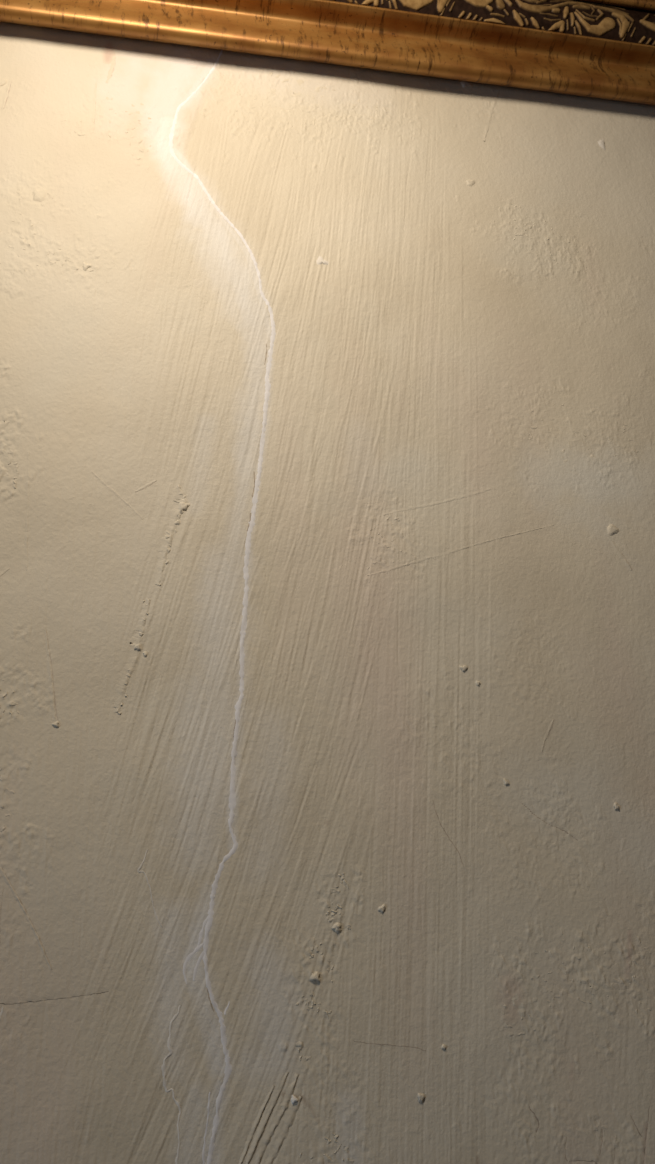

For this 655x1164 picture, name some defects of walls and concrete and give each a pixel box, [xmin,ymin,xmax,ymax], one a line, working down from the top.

crack [161,50,276,1164]